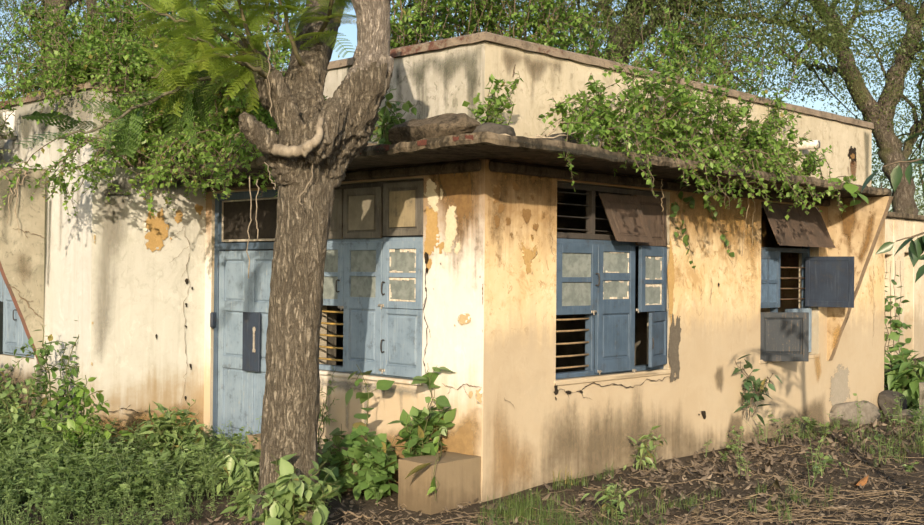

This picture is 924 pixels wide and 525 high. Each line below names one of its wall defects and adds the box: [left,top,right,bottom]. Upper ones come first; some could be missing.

leakage [505,54,543,73]
peeling [144,210,183,252]
peeling [423,178,461,270]
crack [171,221,193,406]
peeling [454,312,471,326]
crack [556,376,668,398]
leakage [553,420,680,462]
leakage [728,418,741,446]
leakage [760,404,823,434]